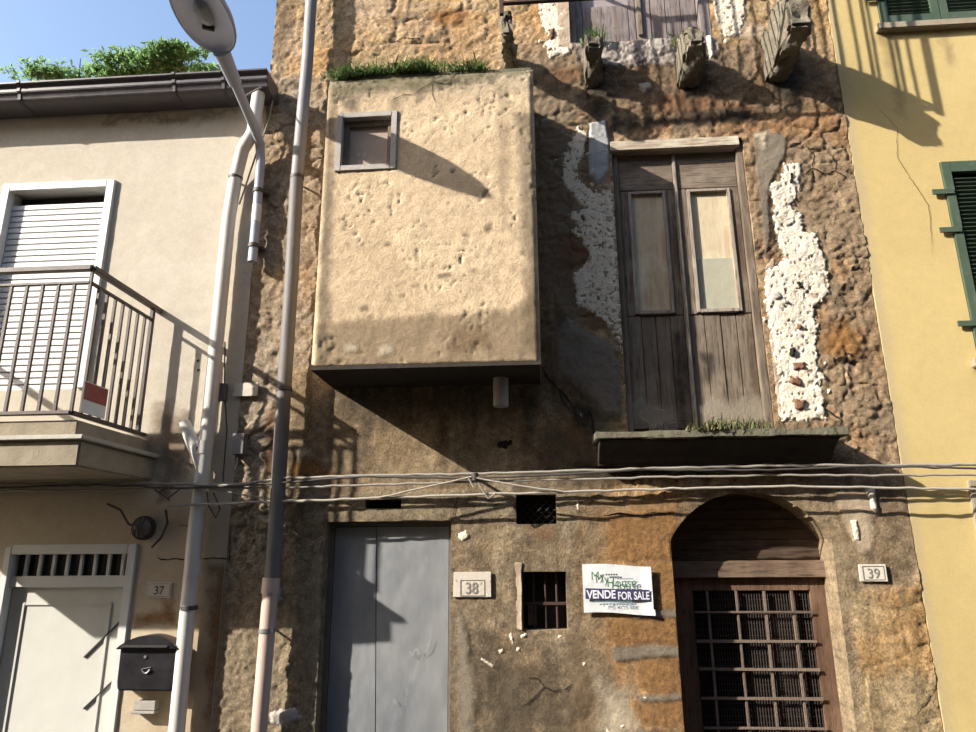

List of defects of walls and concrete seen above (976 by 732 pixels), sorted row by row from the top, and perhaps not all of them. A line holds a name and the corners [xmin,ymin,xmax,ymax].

peeling [538,2,584,82]
spalling [602,37,678,66]
peeling [704,0,769,61]
peeling [555,126,623,354]
peeling [763,162,831,422]
crack [878,108,933,255]